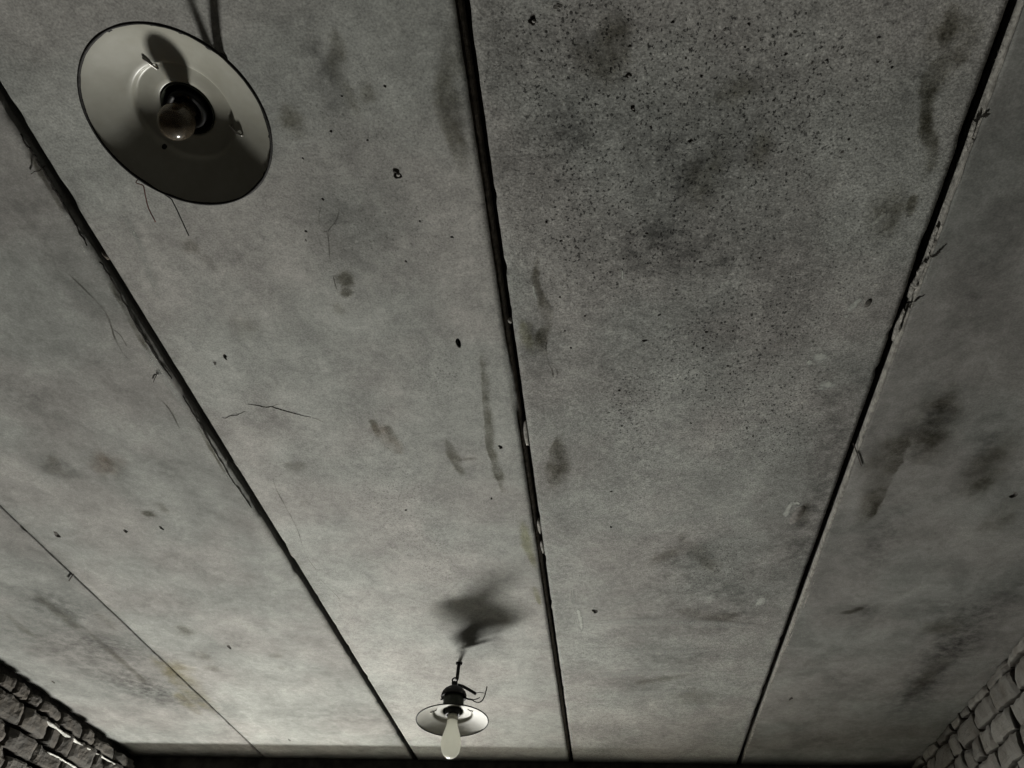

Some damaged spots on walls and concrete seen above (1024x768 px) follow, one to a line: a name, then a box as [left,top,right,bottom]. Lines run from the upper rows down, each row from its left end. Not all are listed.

crack [225,404,308,419]